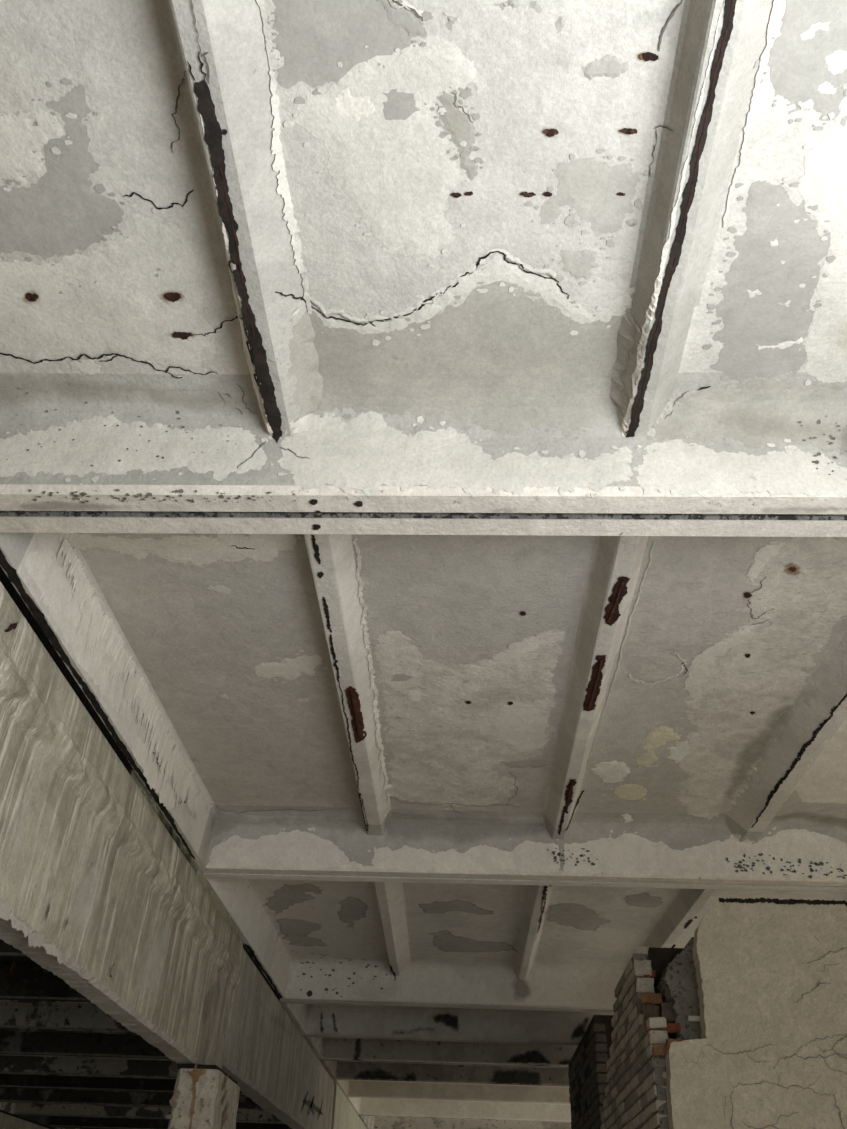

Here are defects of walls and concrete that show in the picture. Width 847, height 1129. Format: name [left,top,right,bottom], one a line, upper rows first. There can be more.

crack [658,0,683,51]
corrosion [639,52,659,61]
peeling [0,78,129,266]
peeling [187,0,847,457]
corrosion [163,292,182,302]
crack [276,248,570,327]
crack [0,353,256,414]
crack [665,386,711,419]
crack [237,441,308,468]
peeling [492,631,565,665]
peeling [495,703,550,756]
crack [751,694,847,828]